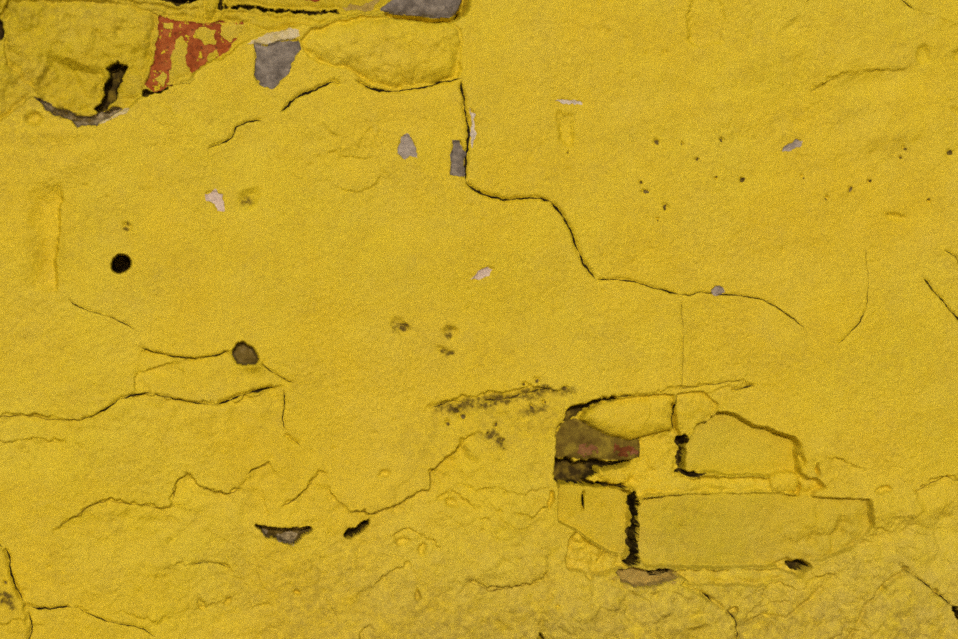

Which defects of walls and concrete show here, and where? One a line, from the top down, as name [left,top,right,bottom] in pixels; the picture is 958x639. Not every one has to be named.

spalling [0,0,405,127]
crack [209,120,259,148]
peeling [397,133,417,159]
peeling [450,109,477,177]
crack [280,78,805,339]
crack [924,279,958,320]
crack [82,365,298,444]
crack [671,373,752,431]
spalling [255,524,311,546]
spalling [344,495,414,538]
spalling [423,379,875,587]
crack [0,544,156,639]